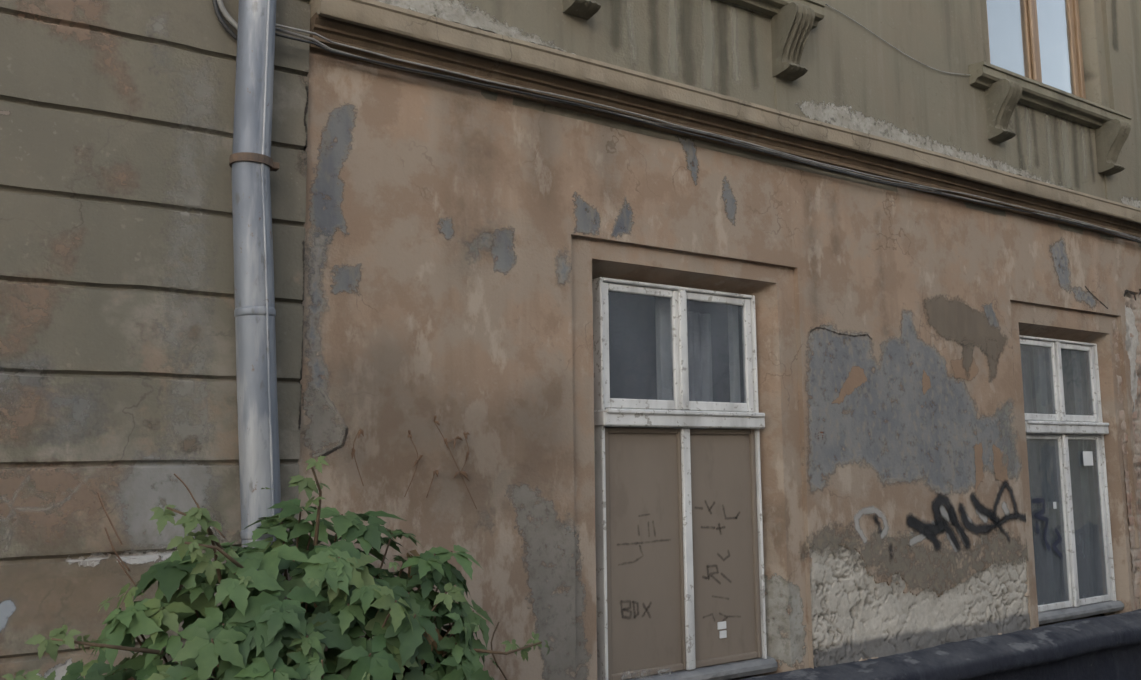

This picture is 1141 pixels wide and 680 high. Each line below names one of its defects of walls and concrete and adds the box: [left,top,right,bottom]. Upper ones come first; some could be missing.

flaking render [375,0,574,54]
flaking render [796,100,1076,191]
peeling [298,71,361,429]
peeling [466,228,517,275]
peeling [573,192,634,237]
peeling [722,176,737,226]
peeling [0,280,56,356]
peeling [806,310,1022,496]
flaking render [1049,238,1141,610]
peeling [0,437,216,567]
flaking render [764,542,1030,668]
flaking render [36,658,81,680]